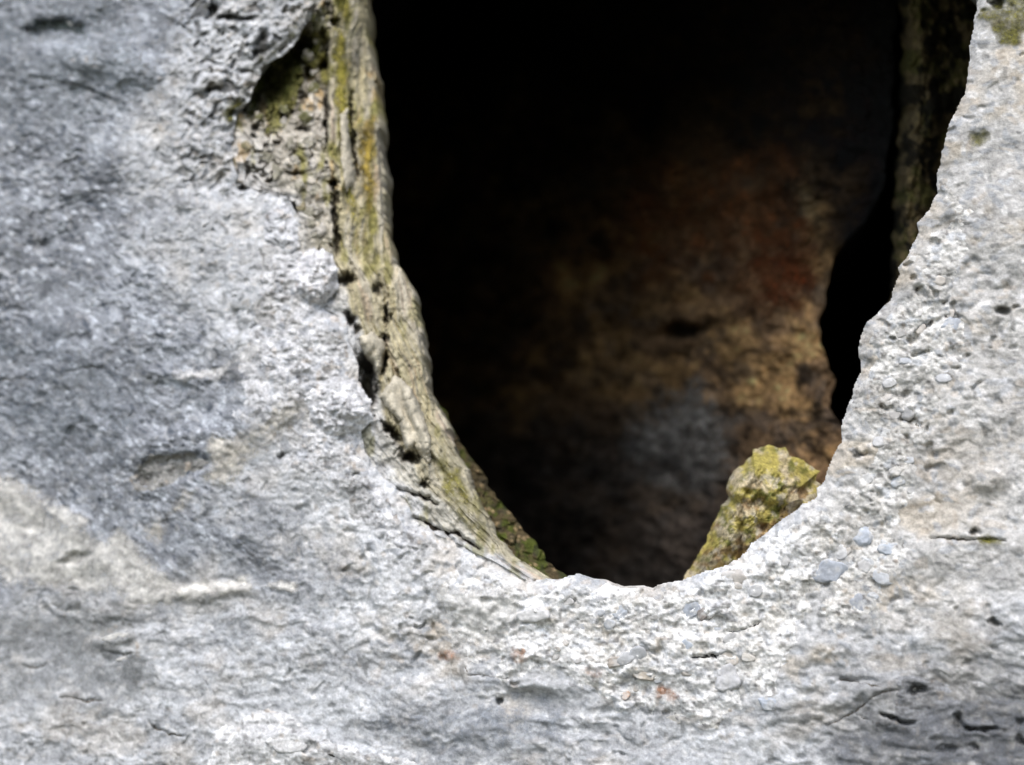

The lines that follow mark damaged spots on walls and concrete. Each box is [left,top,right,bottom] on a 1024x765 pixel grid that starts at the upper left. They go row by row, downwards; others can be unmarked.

spalling [231,34,436,555]
spalling [441,185,974,730]
crack [828,679,914,725]